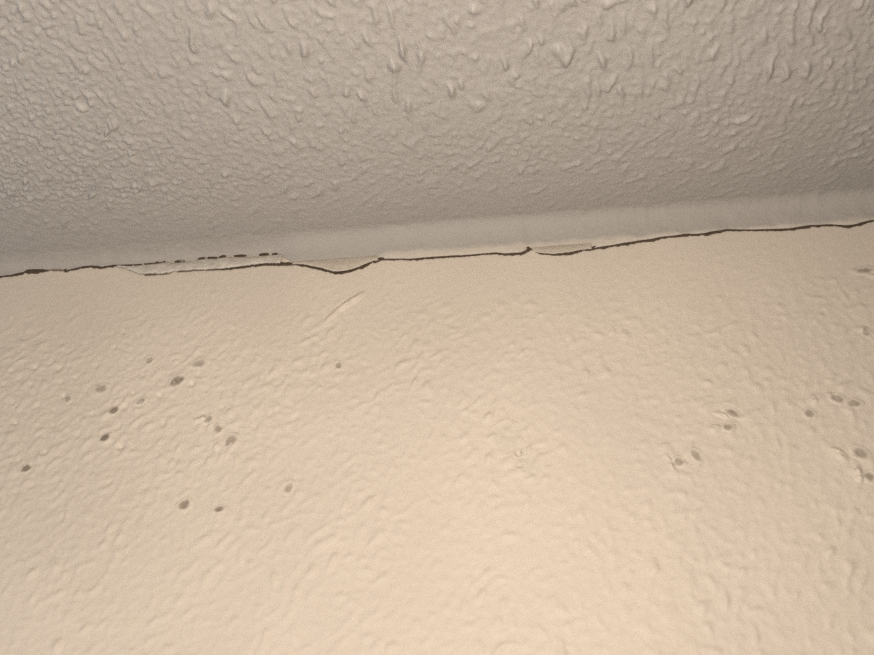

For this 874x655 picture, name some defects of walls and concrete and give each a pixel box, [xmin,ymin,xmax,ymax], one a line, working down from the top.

crack [0,220,874,278]